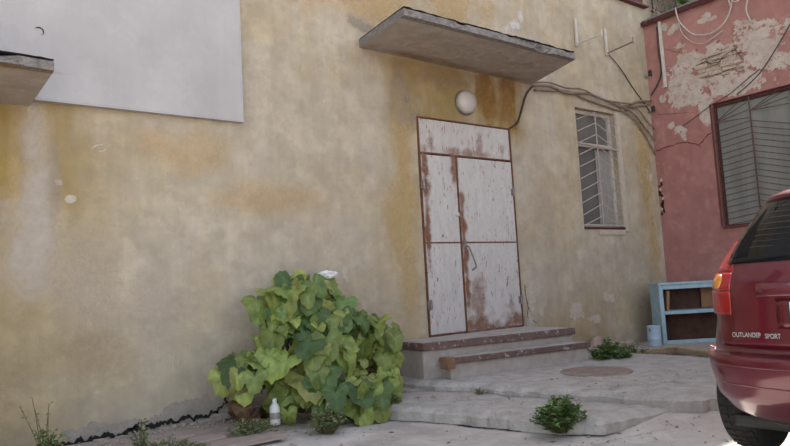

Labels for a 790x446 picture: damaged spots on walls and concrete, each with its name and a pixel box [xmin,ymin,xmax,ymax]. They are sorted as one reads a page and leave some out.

peeling [697,12,717,24]
peeling [659,15,790,126]
leakage [8,101,56,294]
rust [421,153,431,262]
rust [451,146,484,183]
rust [459,192,523,331]
peeling [667,122,688,140]
flaking render [58,393,237,443]